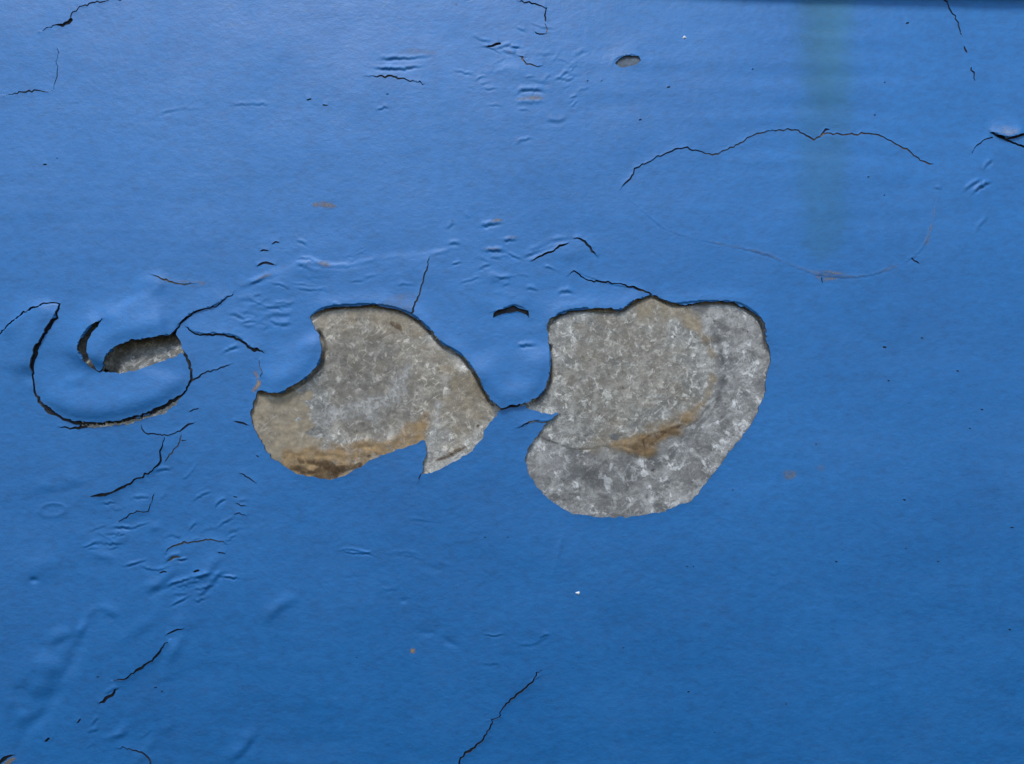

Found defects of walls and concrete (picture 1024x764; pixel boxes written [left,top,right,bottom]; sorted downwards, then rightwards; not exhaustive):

crack [6,0,121,96]
crack [520,0,547,35]
peeling [615,55,641,67]
crack [943,0,975,81]
crack [619,128,942,283]
peeling [0,270,771,518]
crack [87,408,198,548]
crack [76,629,181,764]
crack [458,670,542,764]